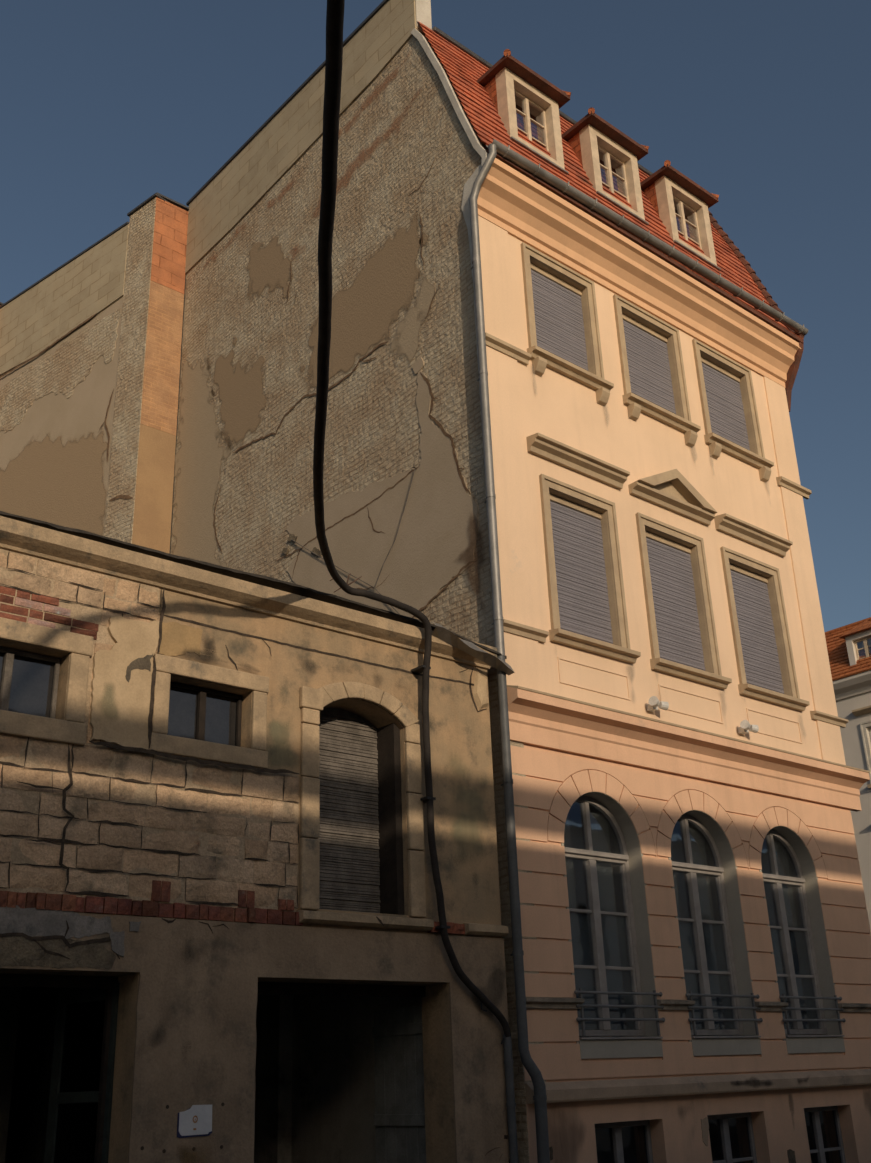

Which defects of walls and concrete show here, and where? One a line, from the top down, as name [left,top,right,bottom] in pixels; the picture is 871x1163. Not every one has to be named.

crack [409,159,440,319]
crack [233,342,388,453]
crack [420,372,471,495]
crack [213,487,222,554]
crack [275,466,419,578]
crack [412,564,468,618]
peeling [0,586,159,754]
crack [17,589,486,892]
crack [0,920,120,959]
peeling [0,905,141,969]